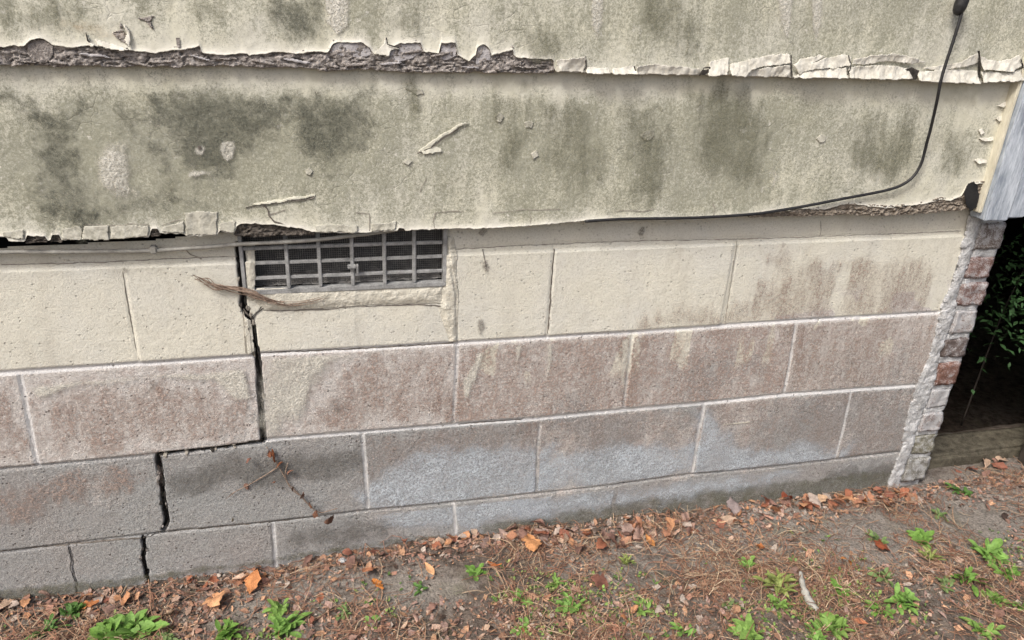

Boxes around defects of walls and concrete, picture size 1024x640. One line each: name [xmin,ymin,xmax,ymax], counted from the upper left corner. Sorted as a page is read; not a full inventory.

spalling [0,0,1024,84]
water stain [0,94,126,241]
peeling [3,211,358,244]
water stain [148,92,374,176]
peeling [371,221,405,232]
peeling [403,122,468,165]
spalling [747,181,985,217]
water stain [51,383,247,454]
crack [0,246,453,588]
water stain [167,260,935,544]